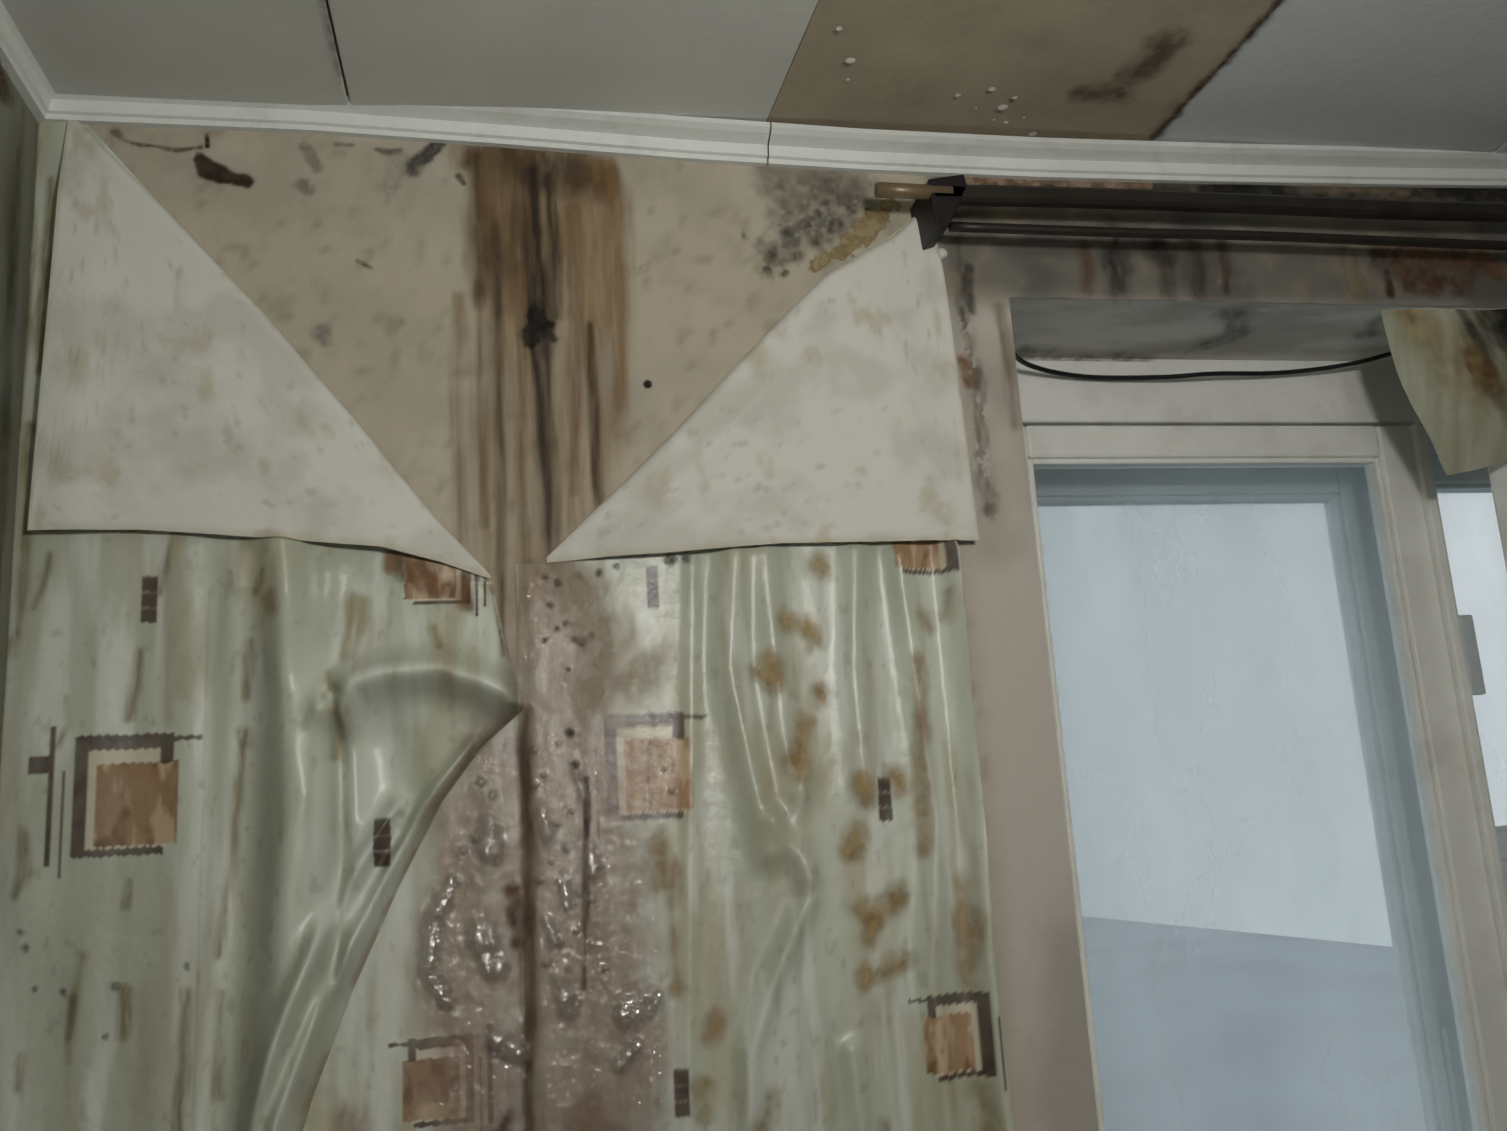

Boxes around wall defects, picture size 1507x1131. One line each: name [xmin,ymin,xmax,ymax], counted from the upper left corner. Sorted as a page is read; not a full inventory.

flaking render [194,136,253,188]
damp [386,143,445,191]
damp [456,147,618,550]
damp [543,564,660,711]